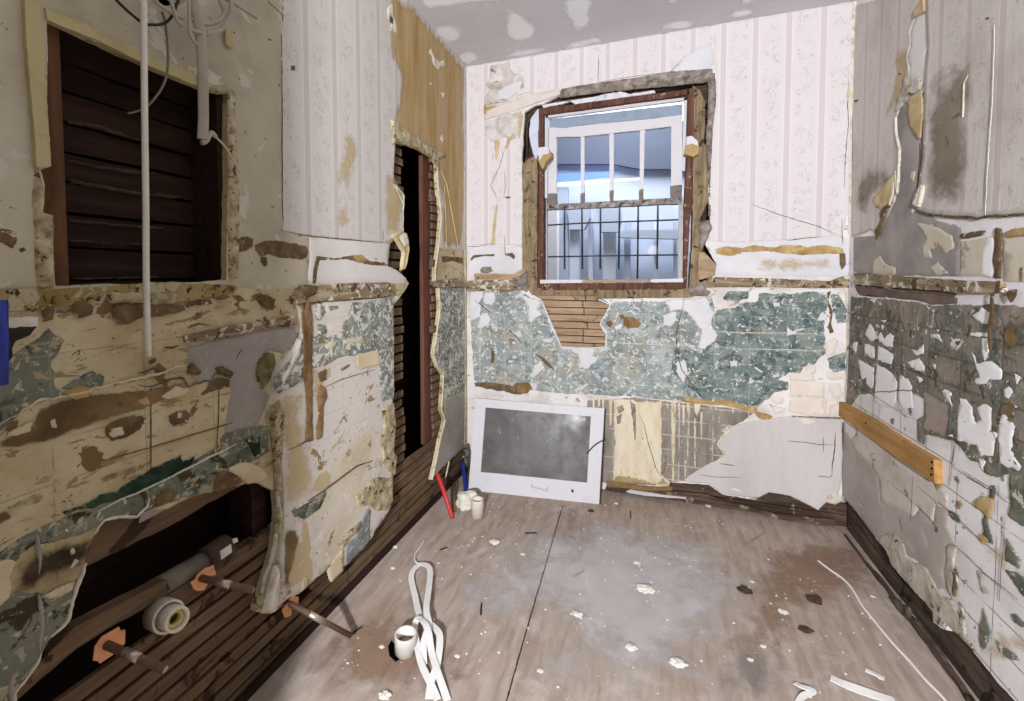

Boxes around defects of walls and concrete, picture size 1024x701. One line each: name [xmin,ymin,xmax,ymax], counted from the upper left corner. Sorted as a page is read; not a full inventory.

flaking render [484,63,524,106]
crack [752,204,871,242]
flaking render [848,2,961,277]
damp [931,77,967,194]
peeling [985,25,995,215]
peeling [298,120,1024,655]
flaking render [0,300,320,701]